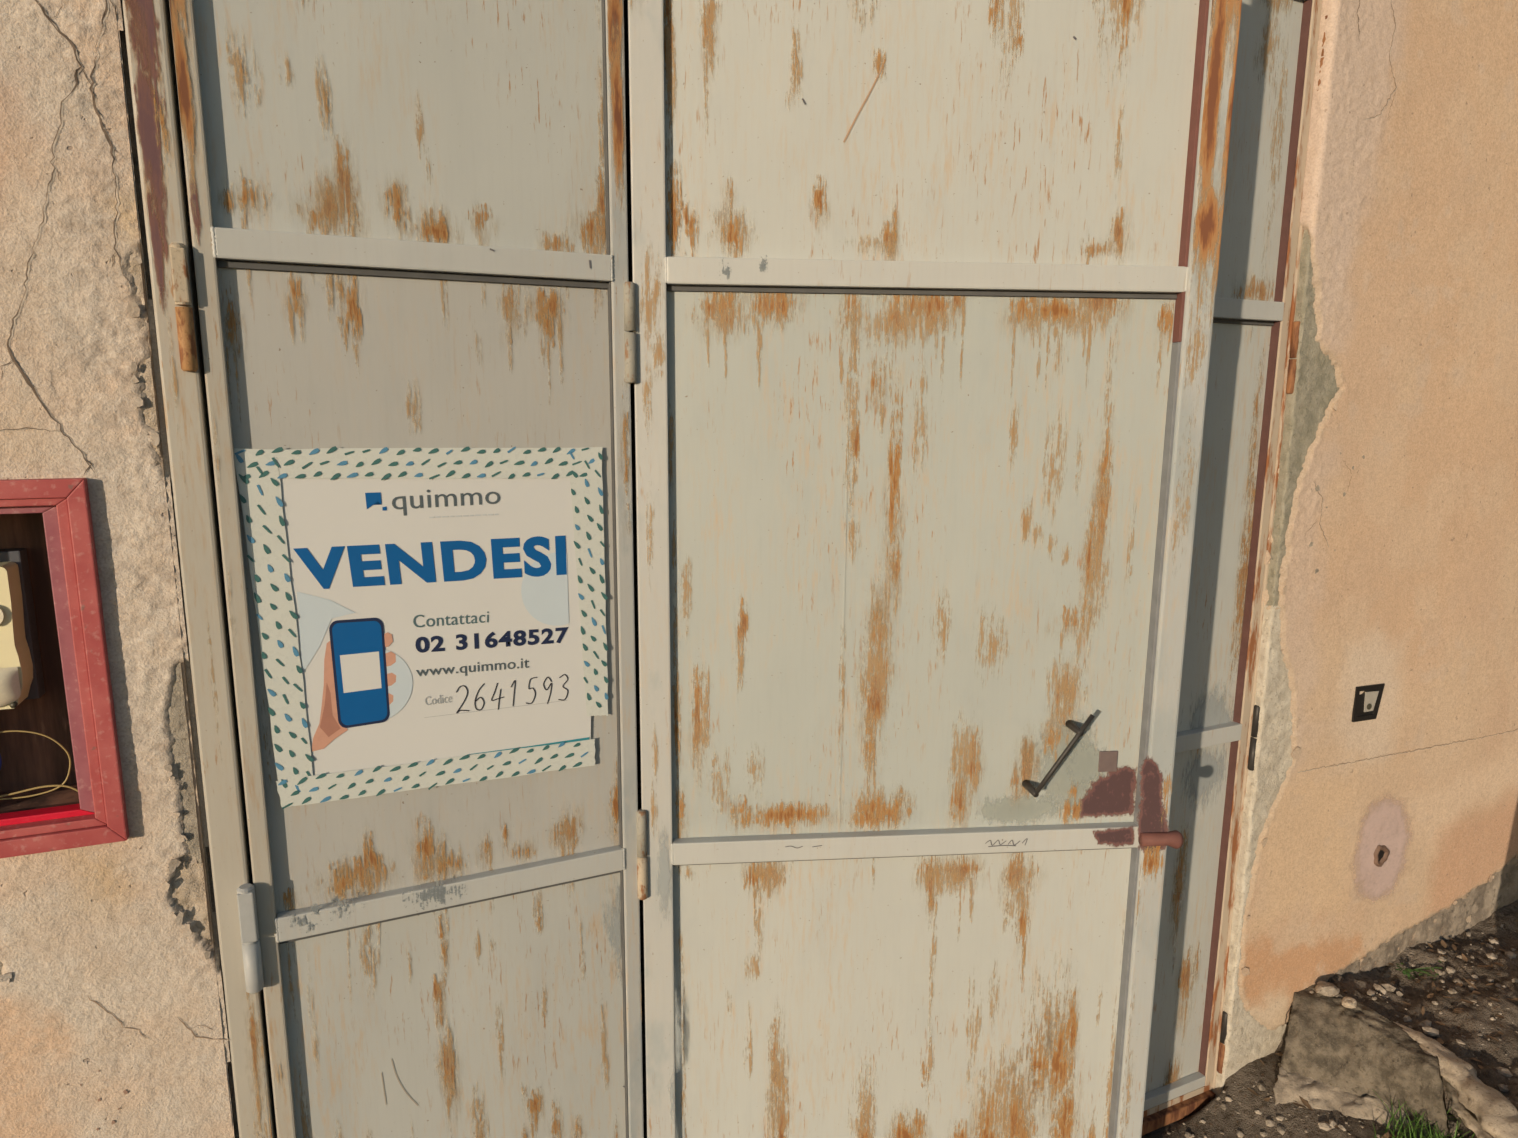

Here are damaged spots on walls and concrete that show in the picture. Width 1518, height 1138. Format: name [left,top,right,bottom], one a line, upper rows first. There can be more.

crack [0,0,131,479]
rust [124,0,201,312]
rust [543,0,632,254]
rust [664,0,747,258]
rust [1157,0,1274,386]
crack [1357,0,1397,120]
rust [672,292,966,838]
rust [1009,297,1129,799]
flaking render [1212,230,1340,1097]
flaking render [0,961,12,984]
rust [954,969,1131,1138]
flaking render [1334,854,1518,976]